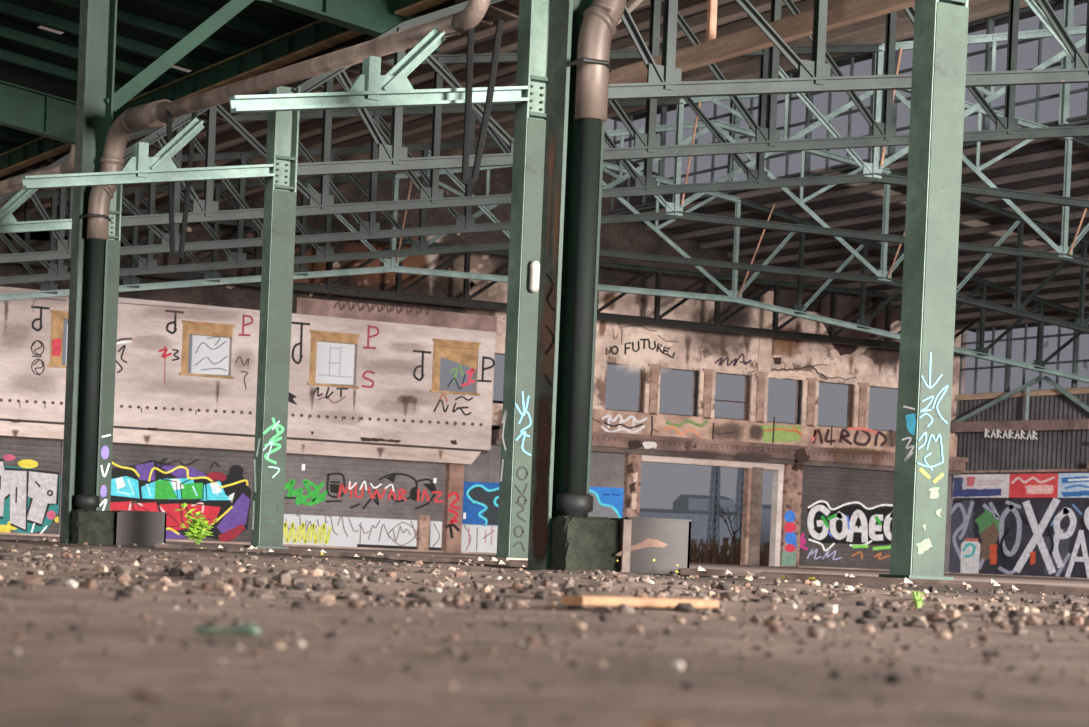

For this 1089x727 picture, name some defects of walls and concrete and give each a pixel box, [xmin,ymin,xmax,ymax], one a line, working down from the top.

rust [548,196,559,256]
water stain [636,263,714,309]
water stain [770,275,876,308]
rust [541,286,556,378]
water stain [686,297,751,361]
water stain [872,336,900,372]
rust [533,396,552,559]